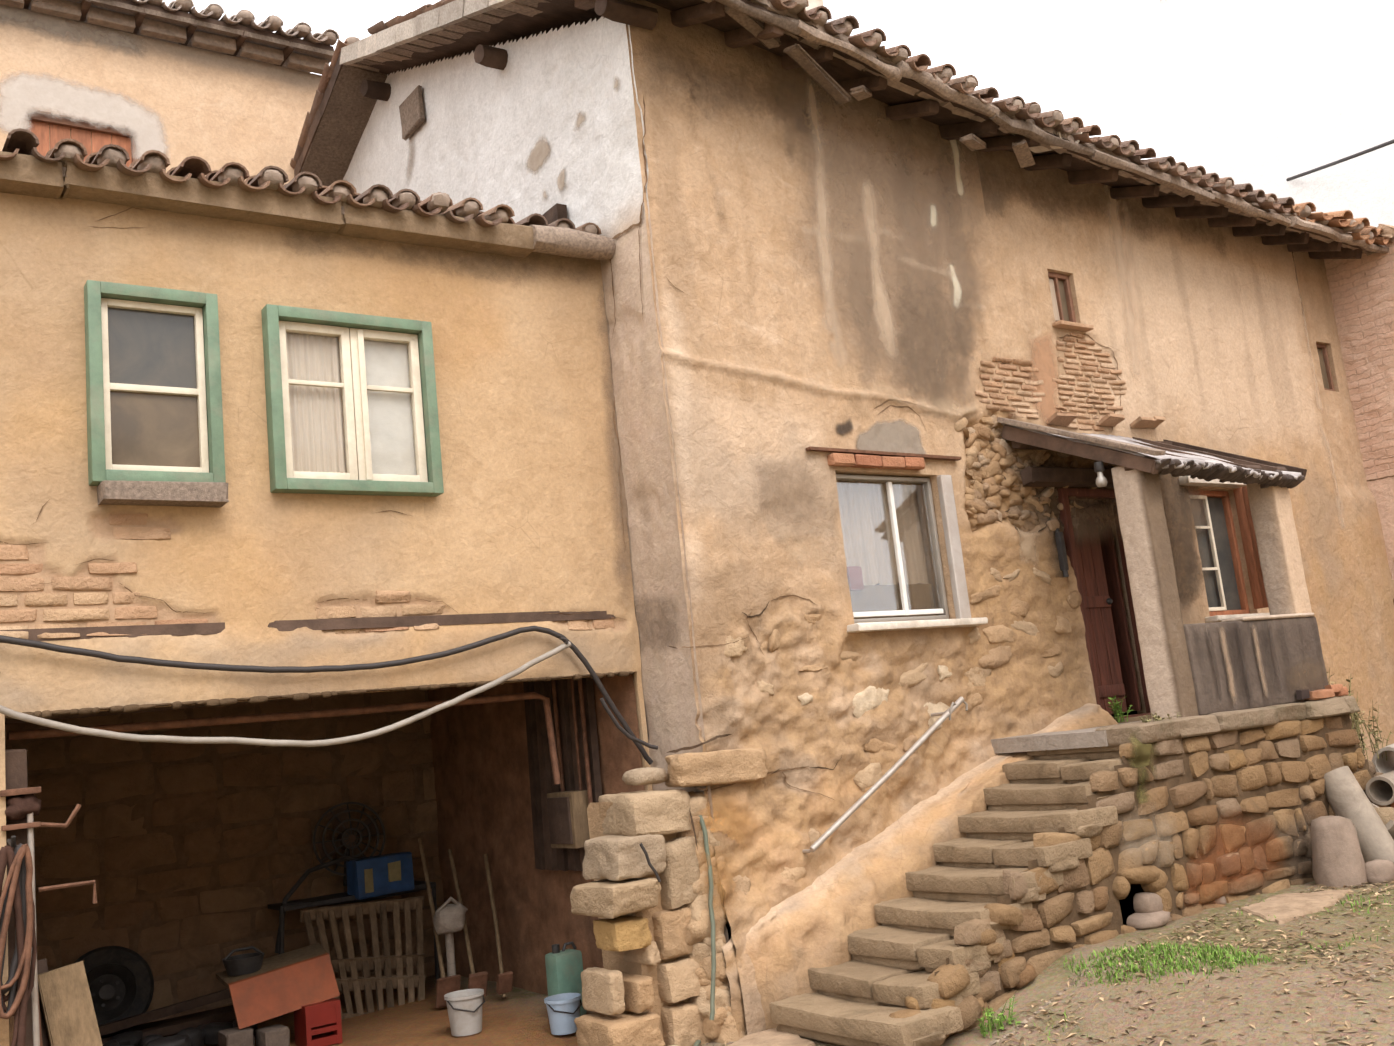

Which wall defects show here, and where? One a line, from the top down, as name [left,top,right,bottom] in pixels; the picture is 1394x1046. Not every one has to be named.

water stain [788,75,1148,403]
spalling [954,333,1127,532]
flaking render [0,541,212,639]
crack [669,595,815,656]
crack [666,734,731,753]
crack [767,753,843,801]
crack [689,783,735,849]